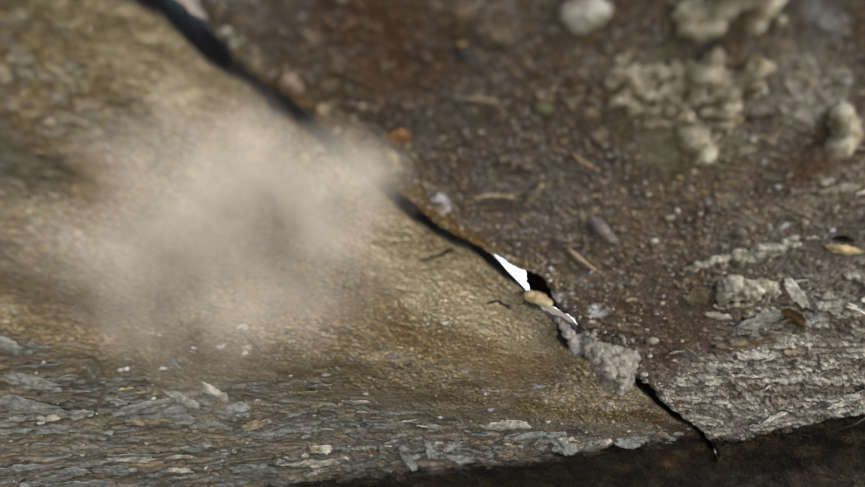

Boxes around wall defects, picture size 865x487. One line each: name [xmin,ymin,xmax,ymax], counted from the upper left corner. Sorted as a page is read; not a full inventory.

efflorescence [803,0,840,38]
efflorescence [604,0,787,175]
efflorescence [782,60,864,160]
peeling [818,178,865,195]
peeling [800,229,865,256]
crack [487,300,510,309]
crack [526,271,568,314]
peeling [685,287,806,363]
crack [635,377,667,406]
peeling [697,369,775,392]
peeling [749,405,793,428]
crack [688,421,716,460]